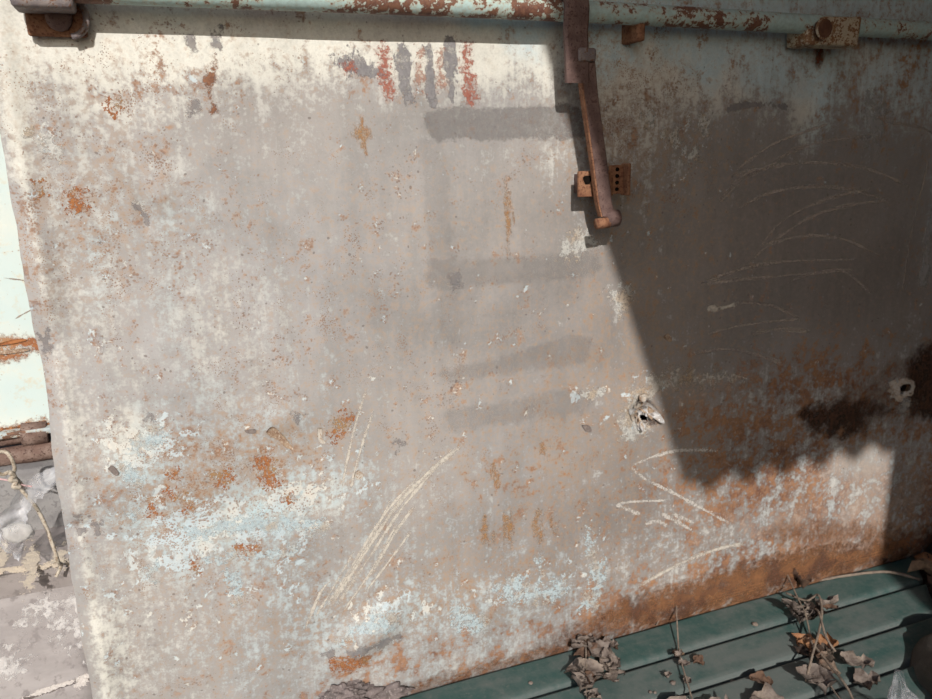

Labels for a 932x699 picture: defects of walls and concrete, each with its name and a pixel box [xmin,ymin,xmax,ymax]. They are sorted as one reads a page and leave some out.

corrosion [0,336,39,362]
leakage [906,344,932,419]
corrosion [325,408,355,445]
leakage [798,400,889,440]
corrosion [144,466,196,518]
corrosion [208,465,239,490]
corrosion [252,449,298,505]
corrosion [232,541,266,561]
corrosion [525,524,932,659]